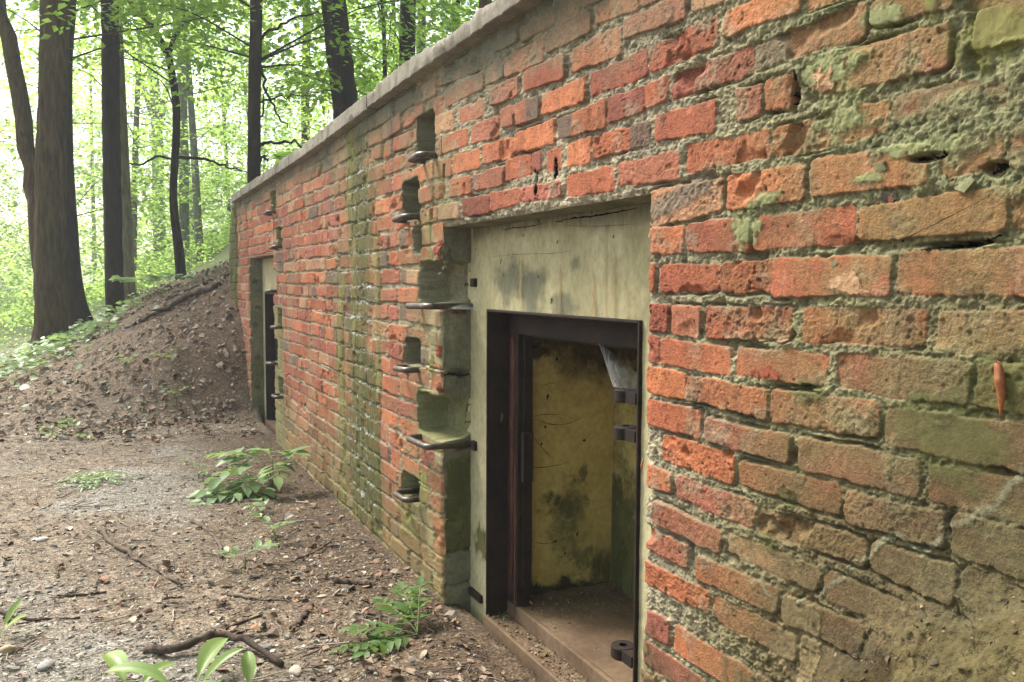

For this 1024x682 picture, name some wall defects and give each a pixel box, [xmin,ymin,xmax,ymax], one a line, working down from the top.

crack [503,208,635,230]
crack [894,196,1002,251]
water stain [500,264,542,310]
water stain [312,85,417,539]
water stain [523,335,637,382]
water stain [531,550,611,595]